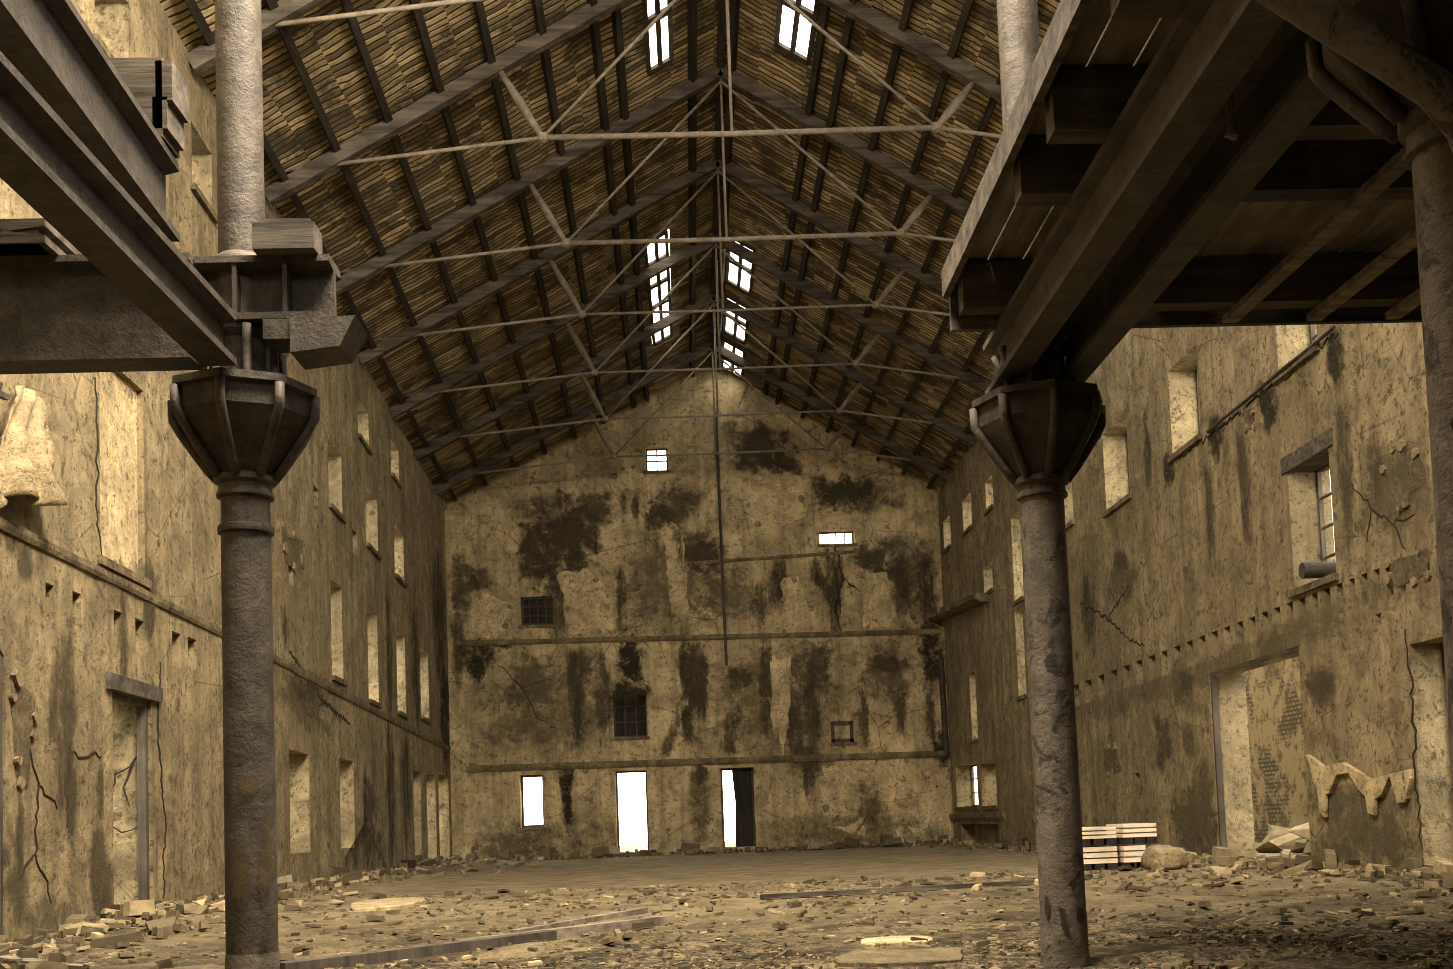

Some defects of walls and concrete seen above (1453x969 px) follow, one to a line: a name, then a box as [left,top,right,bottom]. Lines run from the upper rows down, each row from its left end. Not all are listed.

leakage [515,484,938,796]
leakage [489,648,617,747]
leakage [926,694,950,768]
crack [19,662,167,904]
leakage [689,765,711,841]
flaking render [1306,755,1414,817]